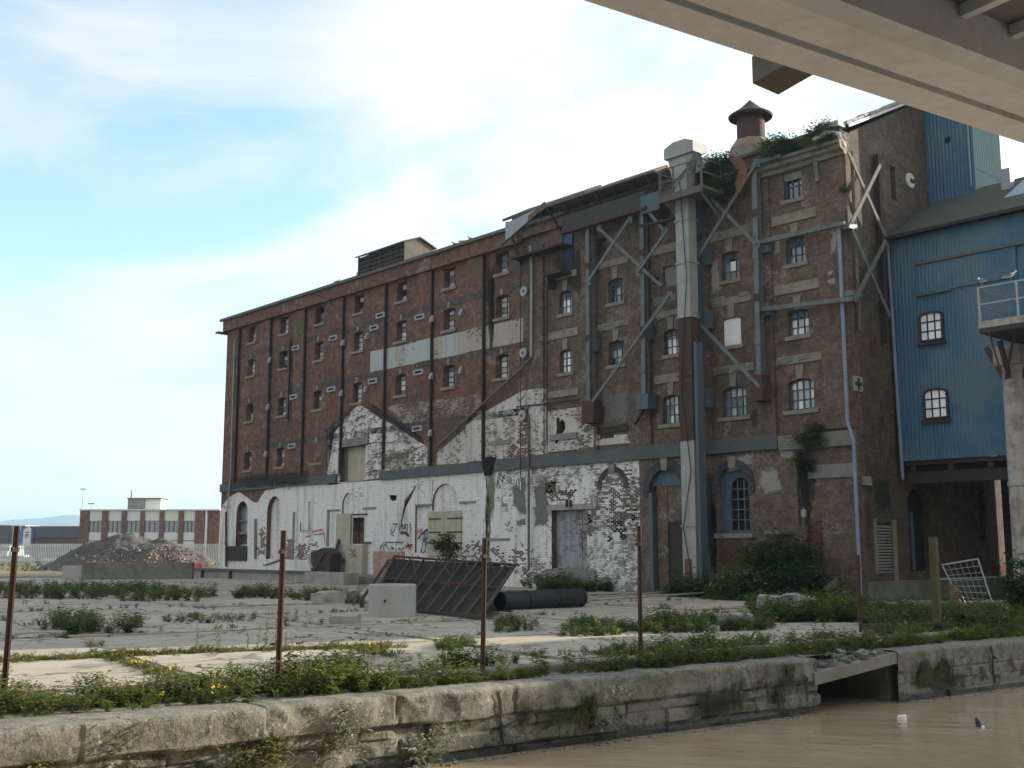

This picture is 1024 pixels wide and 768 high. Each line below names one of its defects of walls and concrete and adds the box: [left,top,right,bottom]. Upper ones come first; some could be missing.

peeling [368,430,426,471]
peeling [481,412,529,476]
spalling [507,470,577,527]
peeling [564,459,660,558]